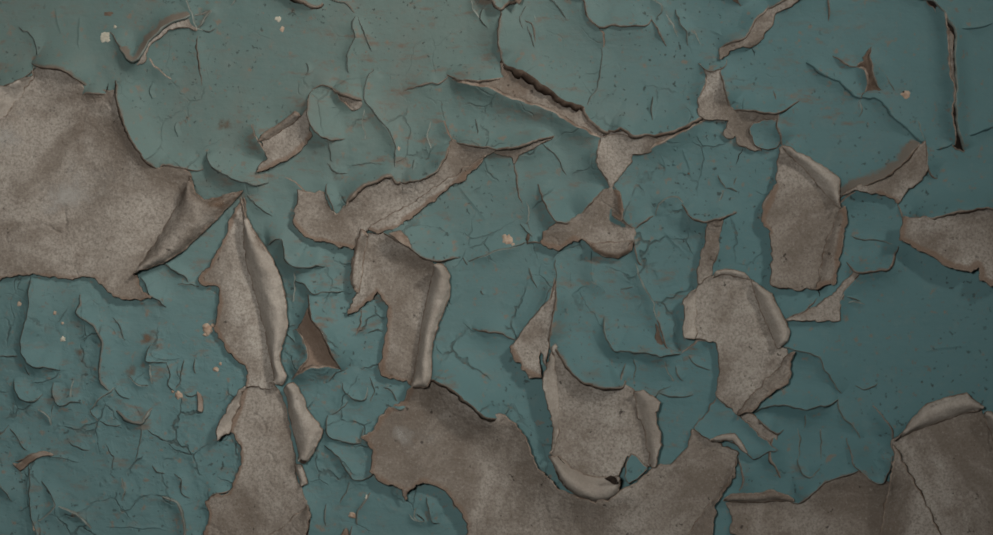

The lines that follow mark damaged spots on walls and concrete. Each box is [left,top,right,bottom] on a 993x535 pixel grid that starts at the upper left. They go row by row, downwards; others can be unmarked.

crack [0,277,203,535]
peeling [0,36,243,301]
crack [139,258,199,308]
peeling [233,67,363,173]
peeling [198,121,993,535]
peeling [582,0,673,48]
peeling [681,0,993,297]
crack [806,0,993,152]